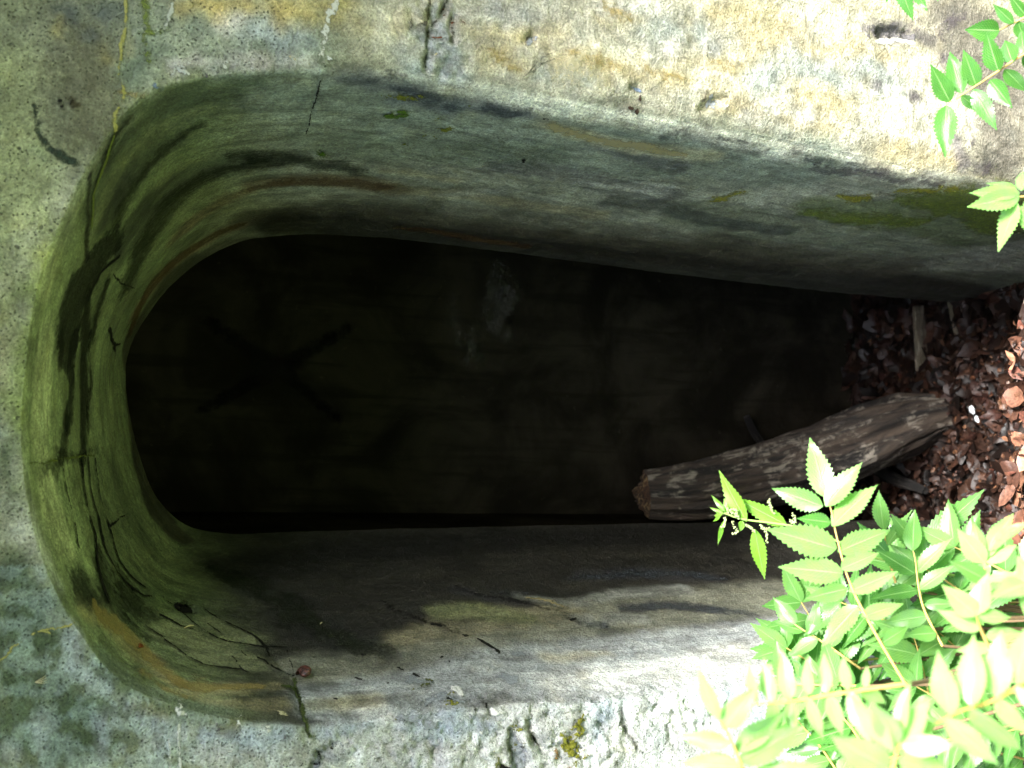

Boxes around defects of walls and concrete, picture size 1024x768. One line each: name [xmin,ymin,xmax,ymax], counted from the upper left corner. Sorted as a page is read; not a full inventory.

crack [306,0,339,134]
damp [56,123,364,472]
crack [29,447,313,738]